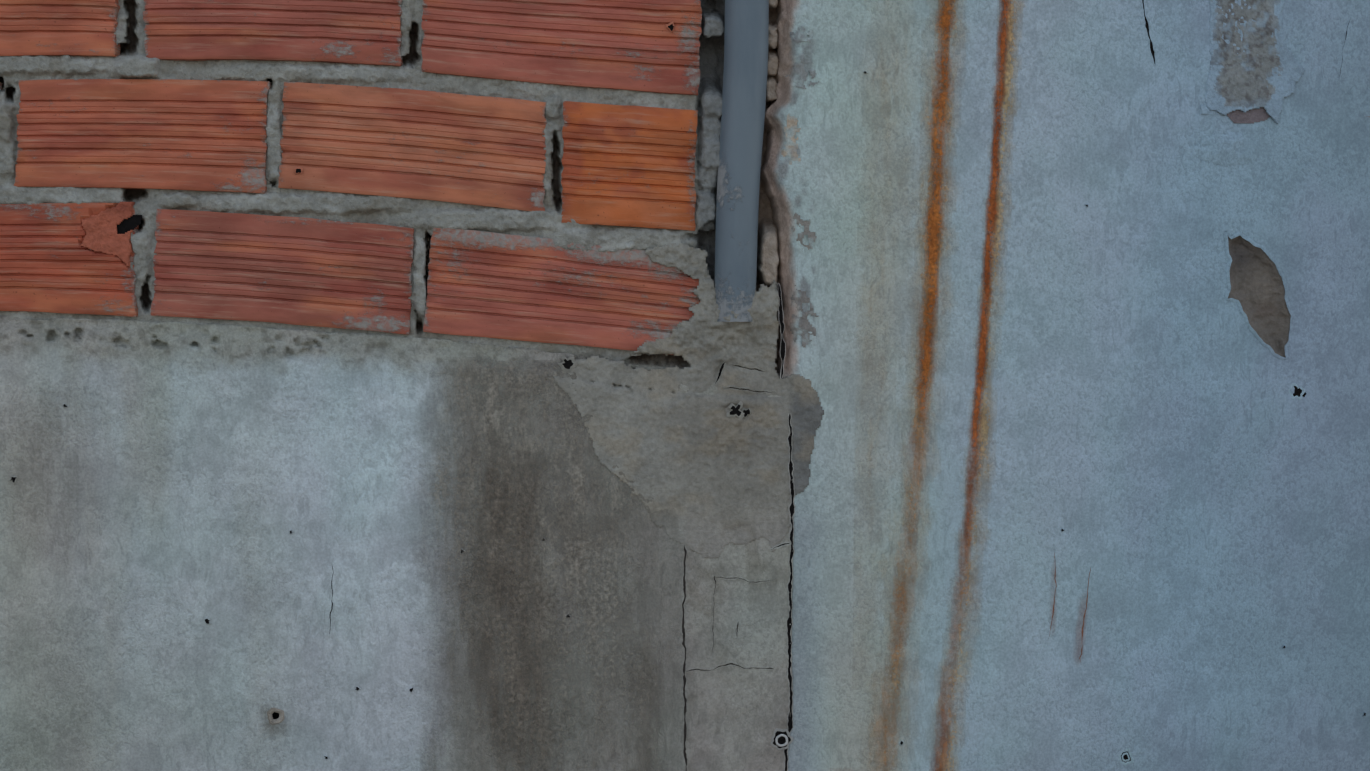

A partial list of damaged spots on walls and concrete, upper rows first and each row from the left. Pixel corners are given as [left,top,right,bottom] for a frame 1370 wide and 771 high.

spalling [80,202,142,266]
rust [914,0,955,459]
rust [961,0,1016,601]
crack [1140,0,1157,65]
peeling [1200,0,1305,124]
spalling [1224,230,1294,360]
damp [433,358,653,771]
crack [680,283,795,771]